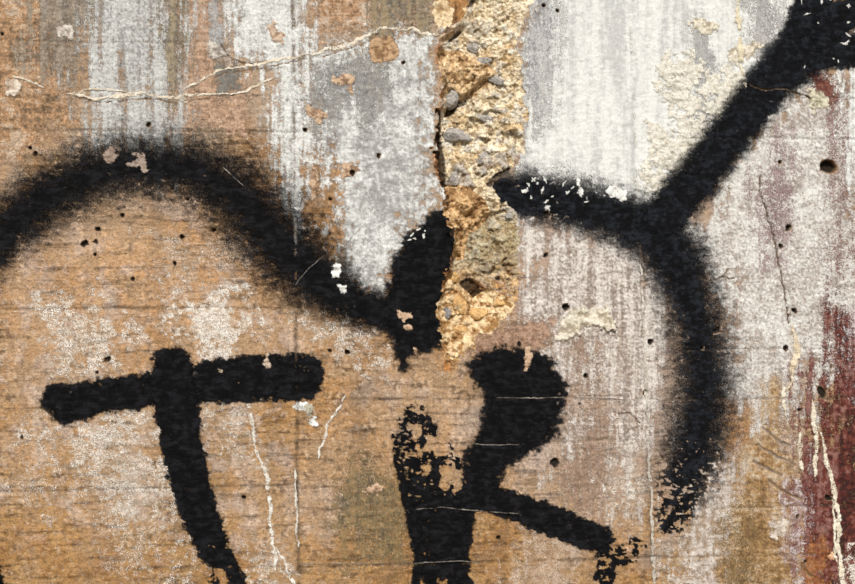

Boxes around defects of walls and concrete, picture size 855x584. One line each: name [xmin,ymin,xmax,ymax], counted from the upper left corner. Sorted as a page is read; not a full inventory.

crack [67,26,440,104]
spalling [429,0,538,372]
peeling [521,176,554,211]
crack [758,177,789,324]
rust [654,71,855,584]